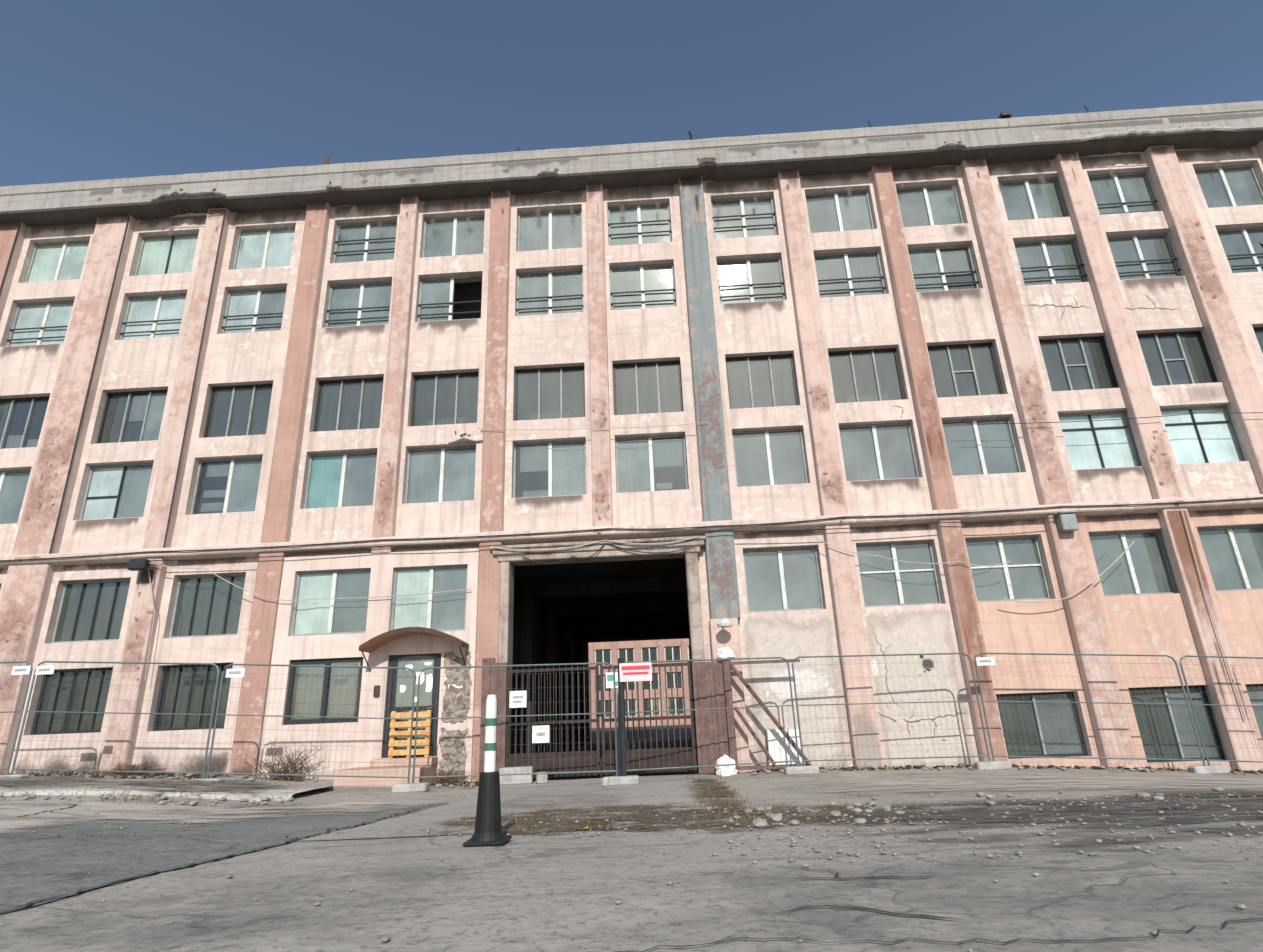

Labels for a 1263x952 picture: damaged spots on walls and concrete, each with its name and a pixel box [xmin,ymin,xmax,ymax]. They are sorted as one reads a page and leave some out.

spalling [151,188,226,203]
crack [873,630,967,736]